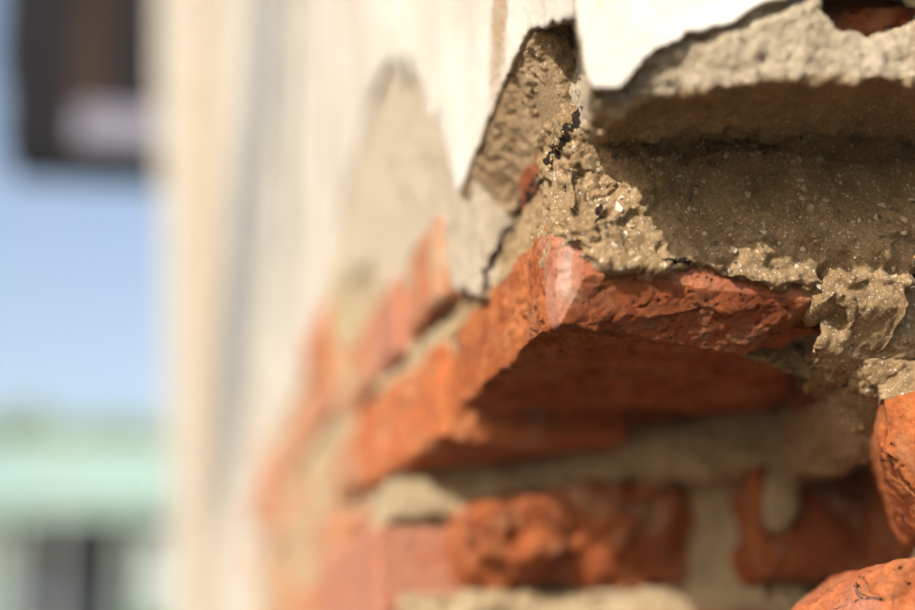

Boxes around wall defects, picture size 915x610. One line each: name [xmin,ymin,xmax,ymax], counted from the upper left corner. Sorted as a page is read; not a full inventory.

crack [481,106,583,285]
spalling [333,0,915,299]
spalling [540,234,811,355]